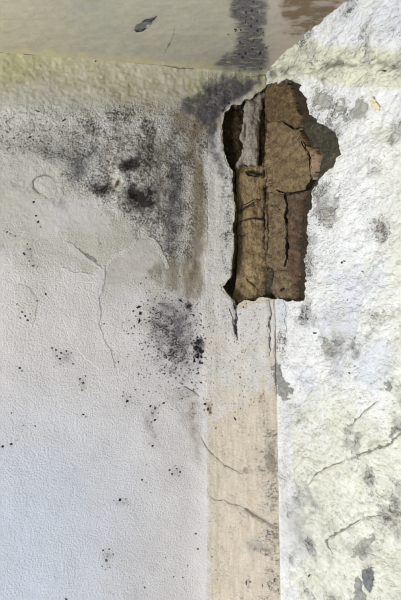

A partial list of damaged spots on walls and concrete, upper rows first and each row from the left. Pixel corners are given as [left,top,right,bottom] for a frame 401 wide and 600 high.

leakage [178,0,269,176]
mould [0,110,186,245]
flaking render [201,78,381,424]
leakage [124,255,213,428]
crack [357,433,401,455]
crack [210,496,279,529]
crack [325,504,401,552]